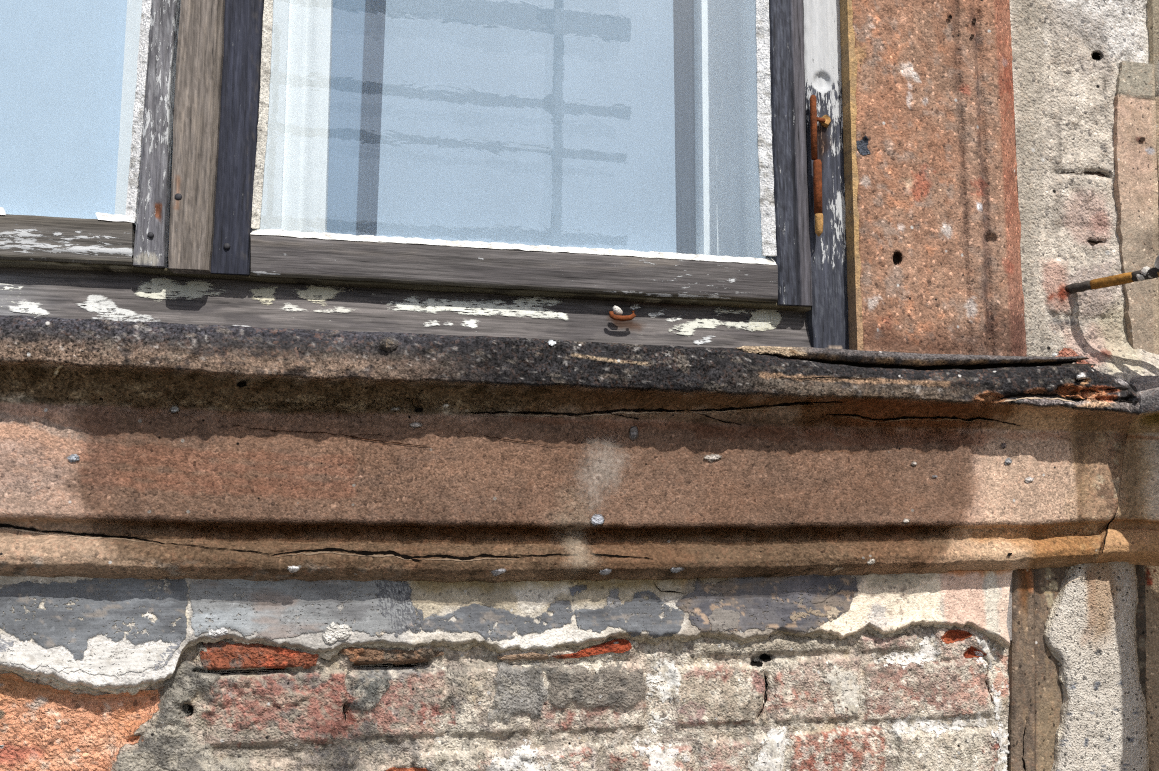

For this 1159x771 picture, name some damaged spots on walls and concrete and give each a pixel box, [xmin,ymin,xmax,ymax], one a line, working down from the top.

peeling [9,301,50,315]
peeling [78,295,156,322]
peeling [135,278,226,301]
peeling [251,285,352,313]
peeling [387,296,568,328]
peeling [630,306,782,345]
crack [463,355,1139,448]
crack [230,425,421,446]
crack [0,524,648,561]
crack [1102,510,1117,553]
spalling [941,629,987,658]
spalling [0,574,858,771]